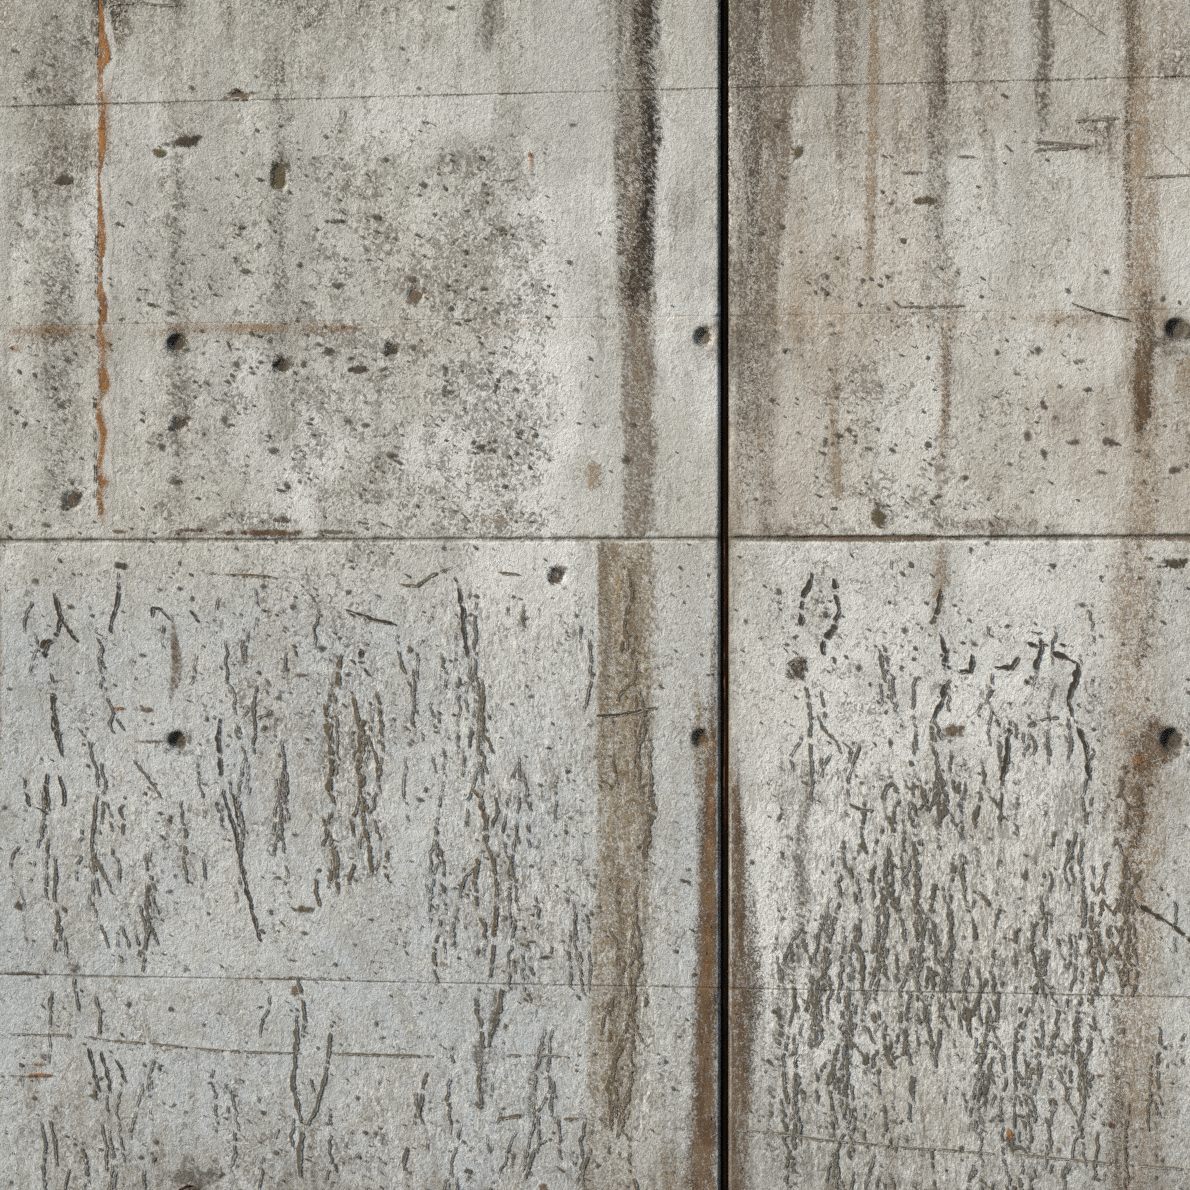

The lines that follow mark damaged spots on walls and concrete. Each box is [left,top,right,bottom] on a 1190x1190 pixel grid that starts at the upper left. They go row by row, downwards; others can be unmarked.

rust [95,0,111,519]
leakage [613,0,663,323]
leakage [731,0,1035,543]
leakage [1007,0,1054,235]
leakage [1154,534,1190,543]
crack [8,566,660,1190]
rust [660,578,765,1190]
crack [737,572,1190,1190]